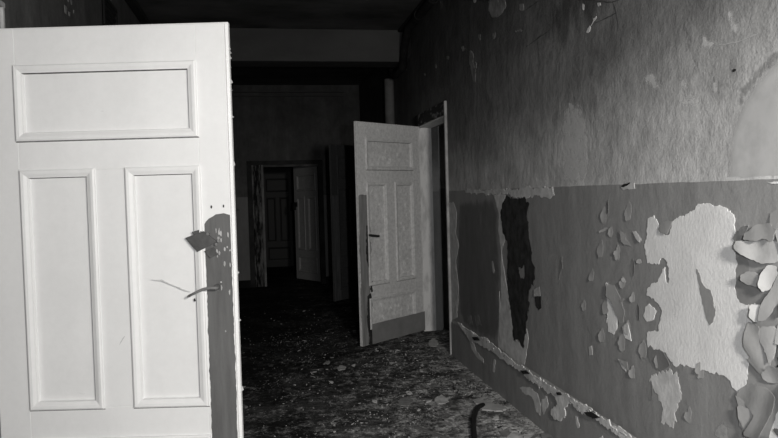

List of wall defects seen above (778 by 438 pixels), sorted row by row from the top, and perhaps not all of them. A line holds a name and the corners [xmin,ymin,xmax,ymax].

damp [730,64,778,178]
spalling [449,186,633,438]
peeling [589,203,778,438]